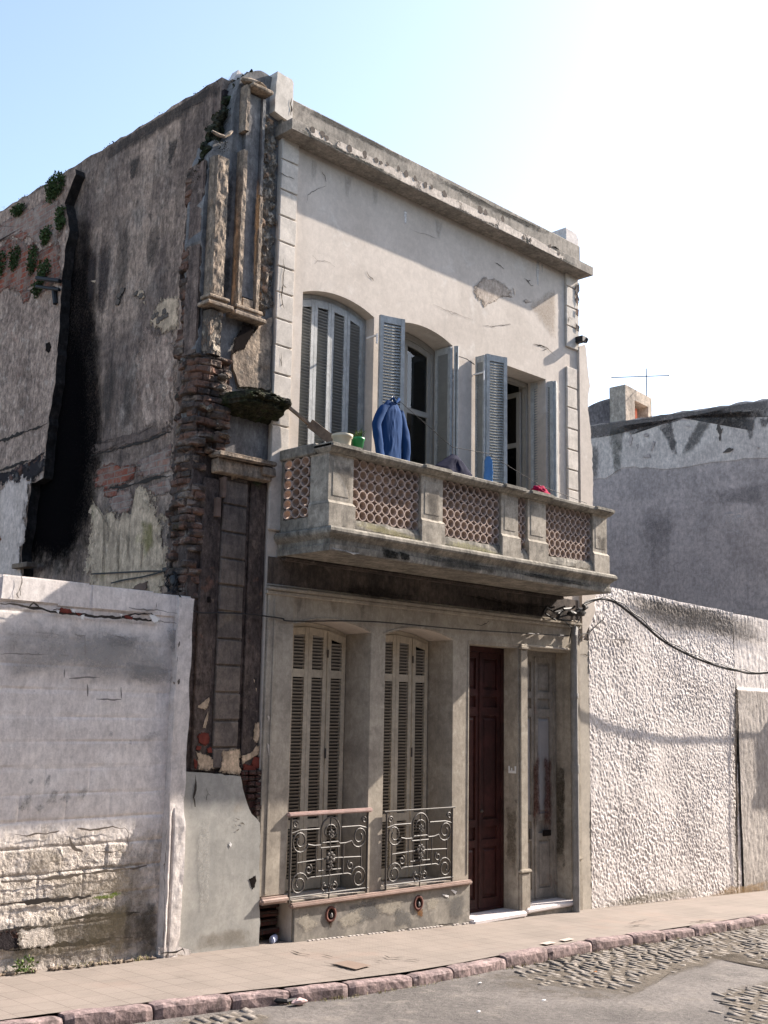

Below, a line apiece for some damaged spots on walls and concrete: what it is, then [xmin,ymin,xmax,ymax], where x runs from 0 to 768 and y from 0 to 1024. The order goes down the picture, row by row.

peeling [307,127,565,259]
peeling [473,276,530,307]
spalling [93,168,255,606]
spalling [194,697,272,818]